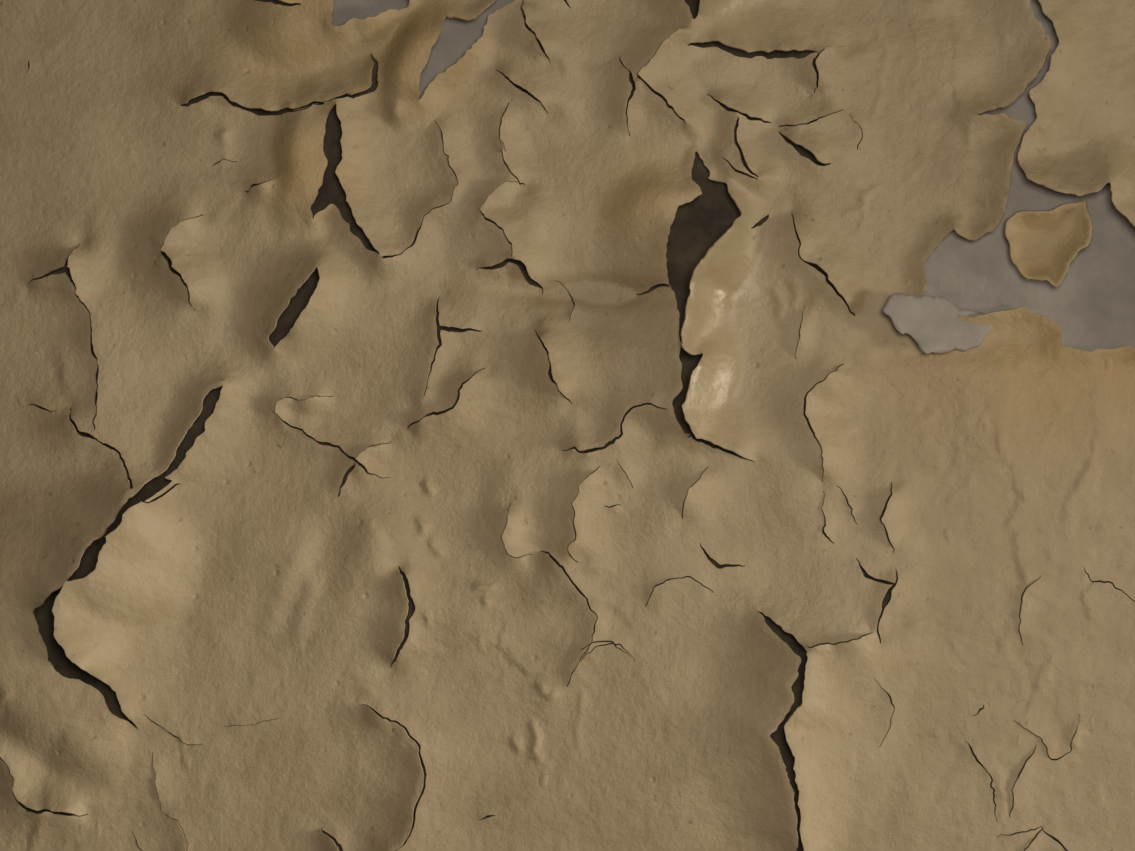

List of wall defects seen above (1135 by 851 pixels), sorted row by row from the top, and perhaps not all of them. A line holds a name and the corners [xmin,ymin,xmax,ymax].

peeling [0,0,824,837]
flaking render [882,0,1135,354]